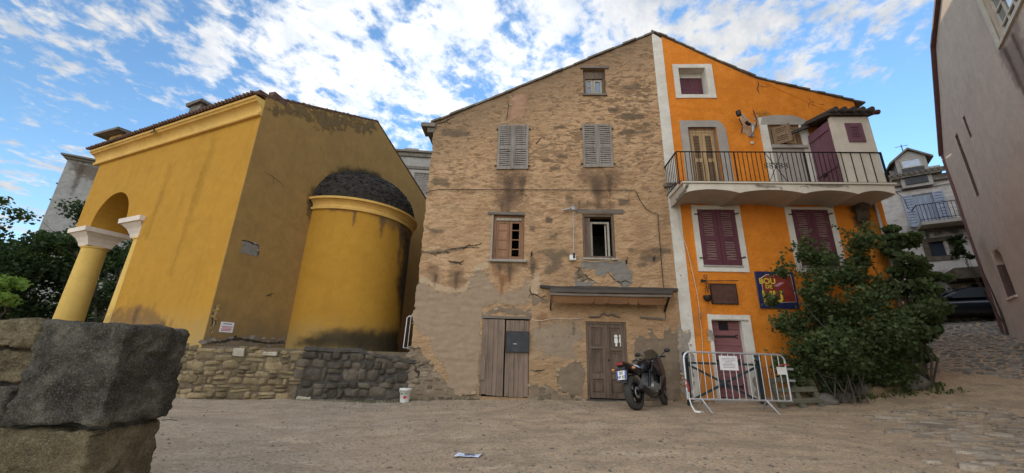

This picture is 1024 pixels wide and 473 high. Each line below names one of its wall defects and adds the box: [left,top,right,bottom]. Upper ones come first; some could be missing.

crack [421,243,482,265]
spalling [573,260,633,287]
water stain [299,330,398,352]
peeling [406,259,501,401]